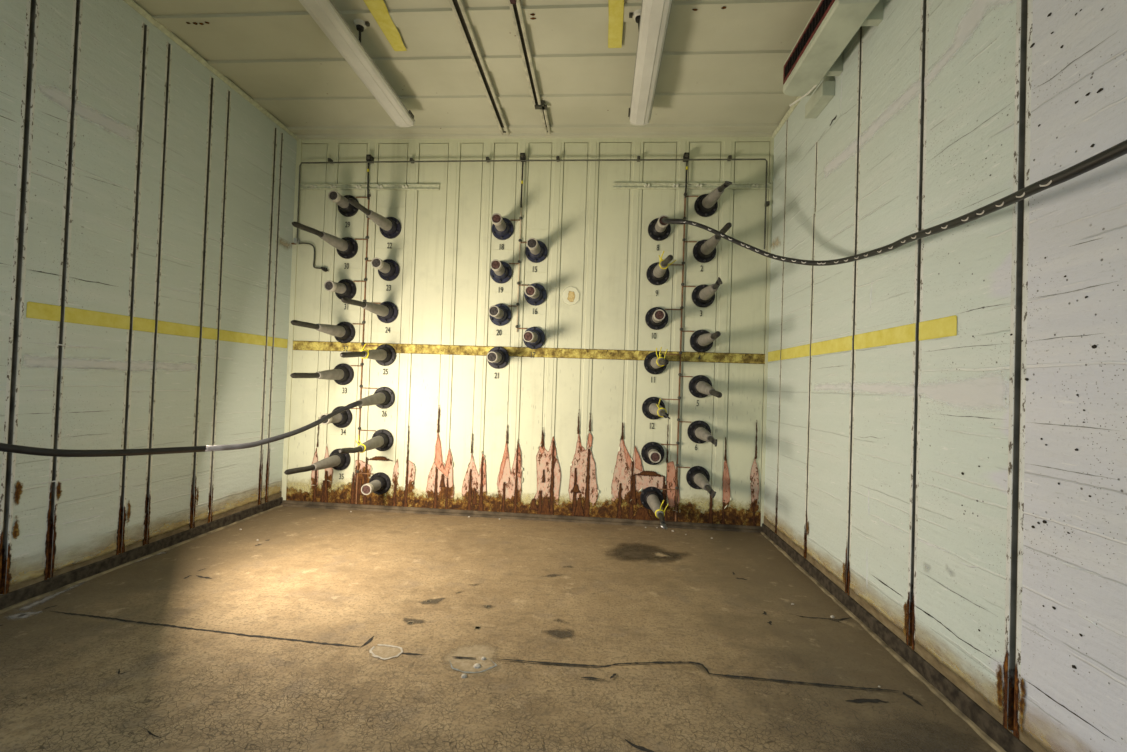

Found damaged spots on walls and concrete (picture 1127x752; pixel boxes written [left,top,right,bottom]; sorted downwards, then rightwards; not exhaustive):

corrosion [0,481,23,594]
corrosion [44,482,62,580]
corrosion [258,449,270,505]
peeling [311,425,333,503]
peeling [350,405,680,528]
corrosion [286,482,761,526]
peeling [708,437,731,524]
peeling [749,422,760,526]
crack [42,606,374,647]
corrosion [903,585,915,650]
corrosion [996,646,1026,739]